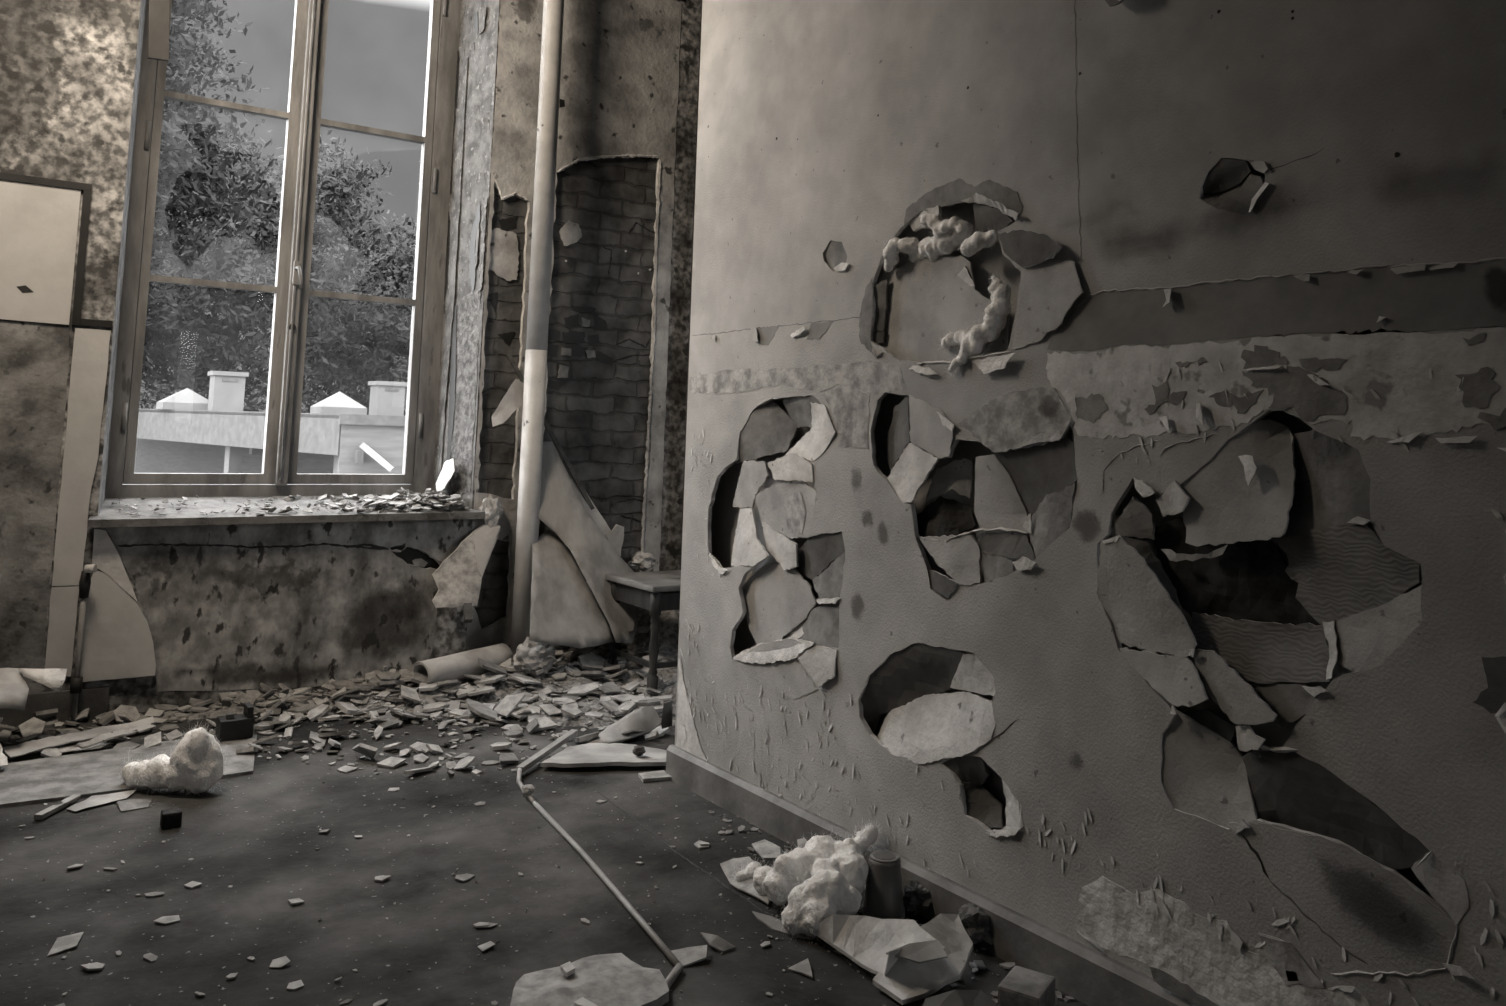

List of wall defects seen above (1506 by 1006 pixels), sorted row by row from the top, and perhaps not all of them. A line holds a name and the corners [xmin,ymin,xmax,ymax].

flaking render [547,154,662,552]
spalling [1201,149,1322,214]
flaking render [390,545,442,569]
spalling [671,178,1506,1006]